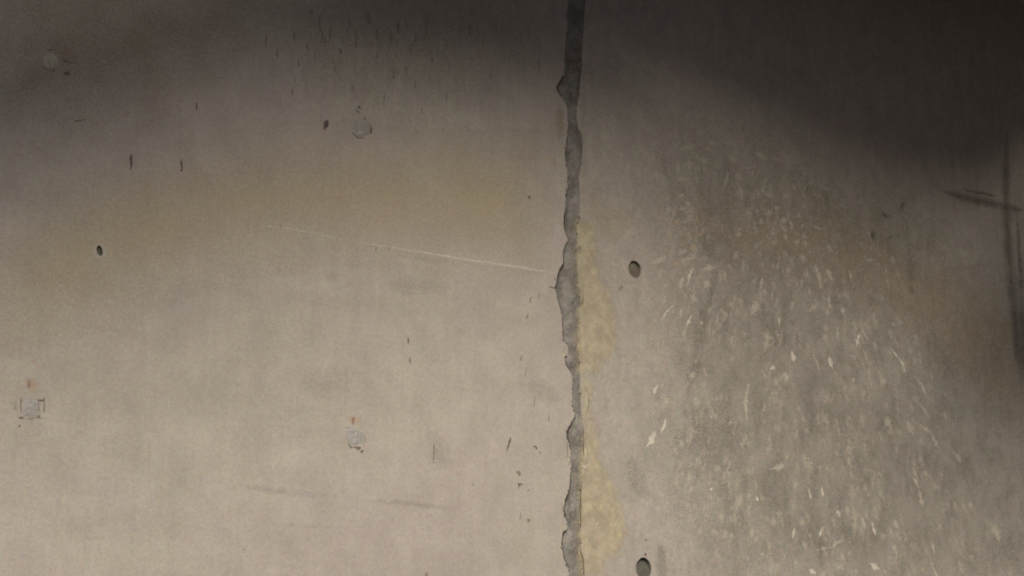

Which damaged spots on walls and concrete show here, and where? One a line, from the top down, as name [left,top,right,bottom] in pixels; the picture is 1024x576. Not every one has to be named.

leakage [571,118,1024,576]